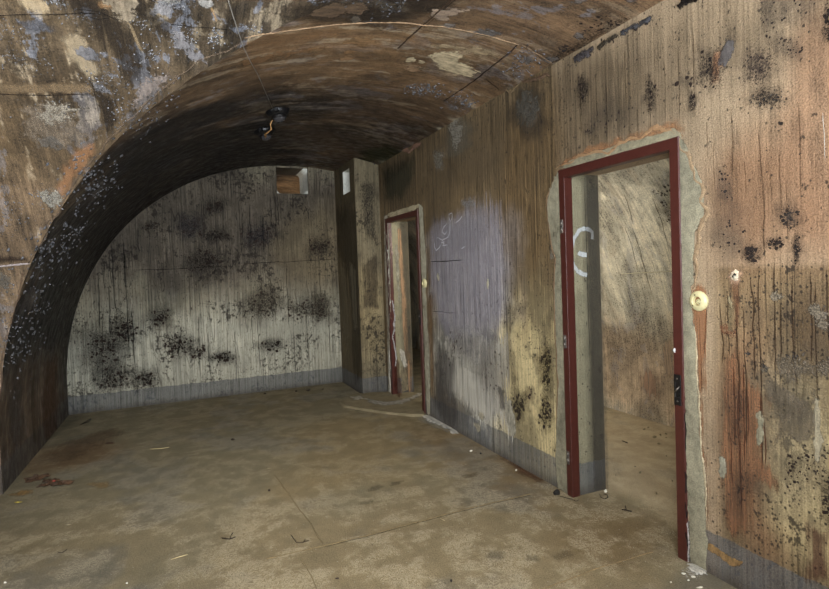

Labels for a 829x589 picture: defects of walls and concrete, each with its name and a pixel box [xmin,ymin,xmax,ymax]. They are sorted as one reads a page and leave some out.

damp [309,1,371,23]
peeling [405,44,500,78]
damp [674,36,787,110]
mould [762,2,803,55]
damp [0,0,336,273]
damp [80,242,159,392]
damp [163,319,237,376]
damp [363,256,378,308]
damp [511,343,553,429]
flaking render [546,124,711,570]
corrosion [692,285,707,434]
corrosion [724,352,779,535]